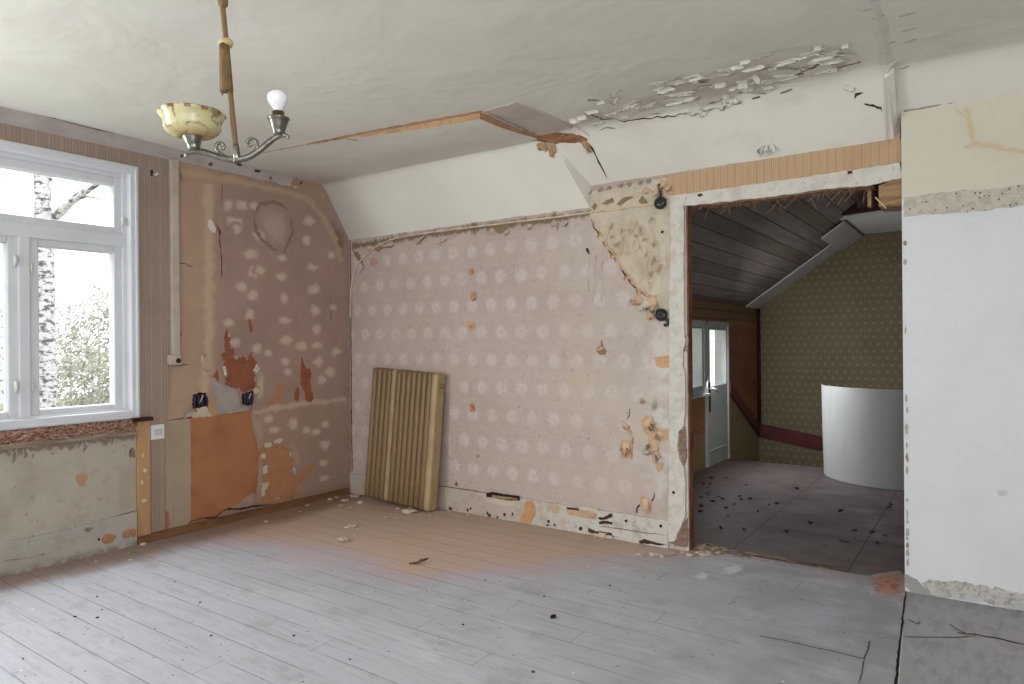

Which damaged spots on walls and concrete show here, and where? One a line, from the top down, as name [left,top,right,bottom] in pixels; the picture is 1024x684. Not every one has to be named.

peeling [483,43,862,158]
crack [586,141,607,178]
spalling [903,185,1024,217]
flaking render [351,177,671,322]
peeling [184,330,314,524]
spalling [620,397,687,473]
peeling [445,498,535,523]
spalling [546,503,614,539]
spalling [639,518,689,547]
flaking render [904,498,1024,611]